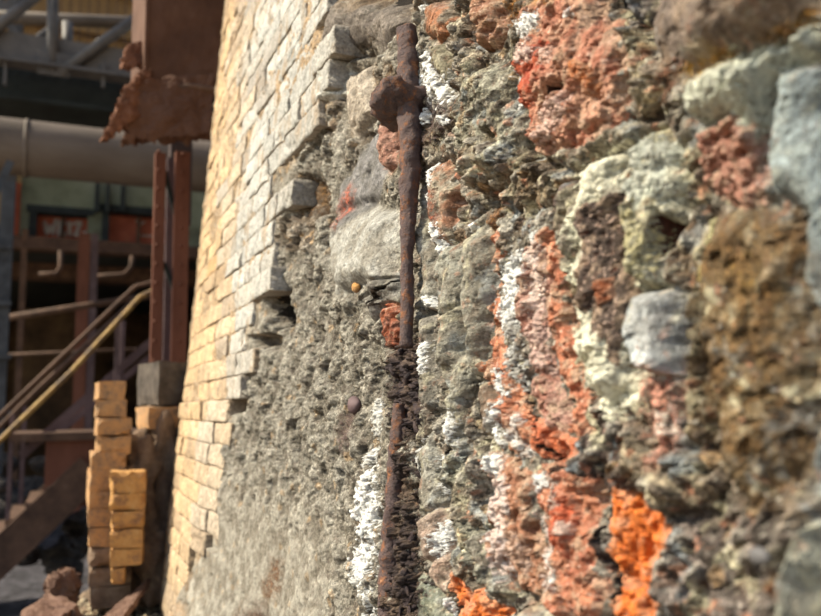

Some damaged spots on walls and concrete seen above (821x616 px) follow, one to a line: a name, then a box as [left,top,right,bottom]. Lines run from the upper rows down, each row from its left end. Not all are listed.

leakage [418,51,458,126]
spalling [469,0,652,156]
spalling [695,112,773,215]
spalling [647,215,687,258]
spalling [276,296,297,327]
rust [382,333,432,442]
leakage [479,230,577,592]
crack [507,340,567,484]
spalling [475,192,672,616]
leakage [344,398,386,616]
spalling [448,572,517,616]
spalling [748,546,771,565]